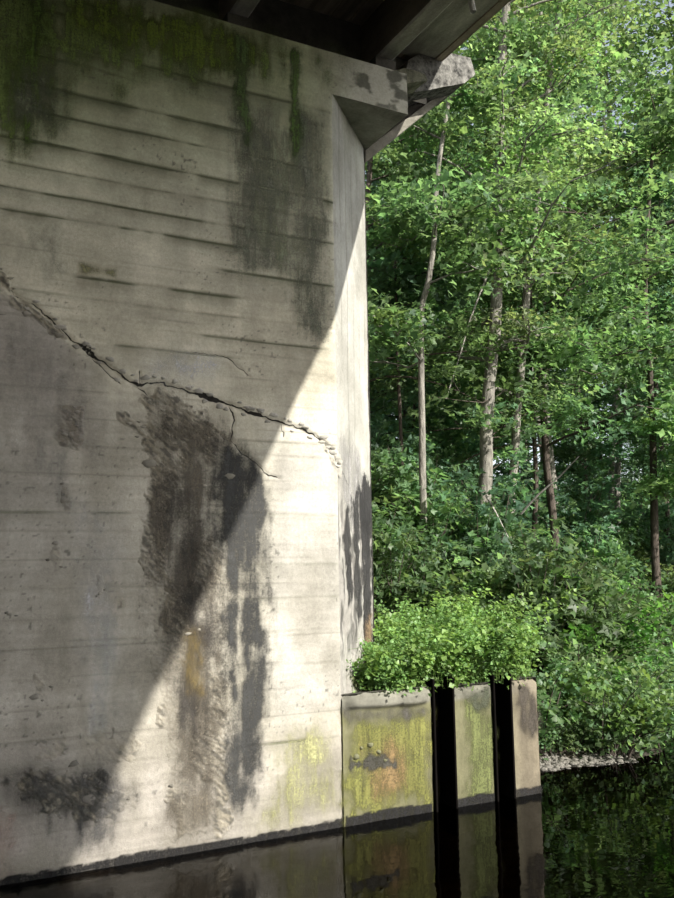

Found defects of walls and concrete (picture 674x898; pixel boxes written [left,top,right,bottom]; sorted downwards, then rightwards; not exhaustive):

leakage [72,0,327,335]
peeling [0,268,69,341]
crack [0,291,353,502]
leakage [0,411,432,886]
spalling [0,724,146,825]
rust [374,740,405,796]
leakage [458,793,495,807]
leakage [516,786,542,797]